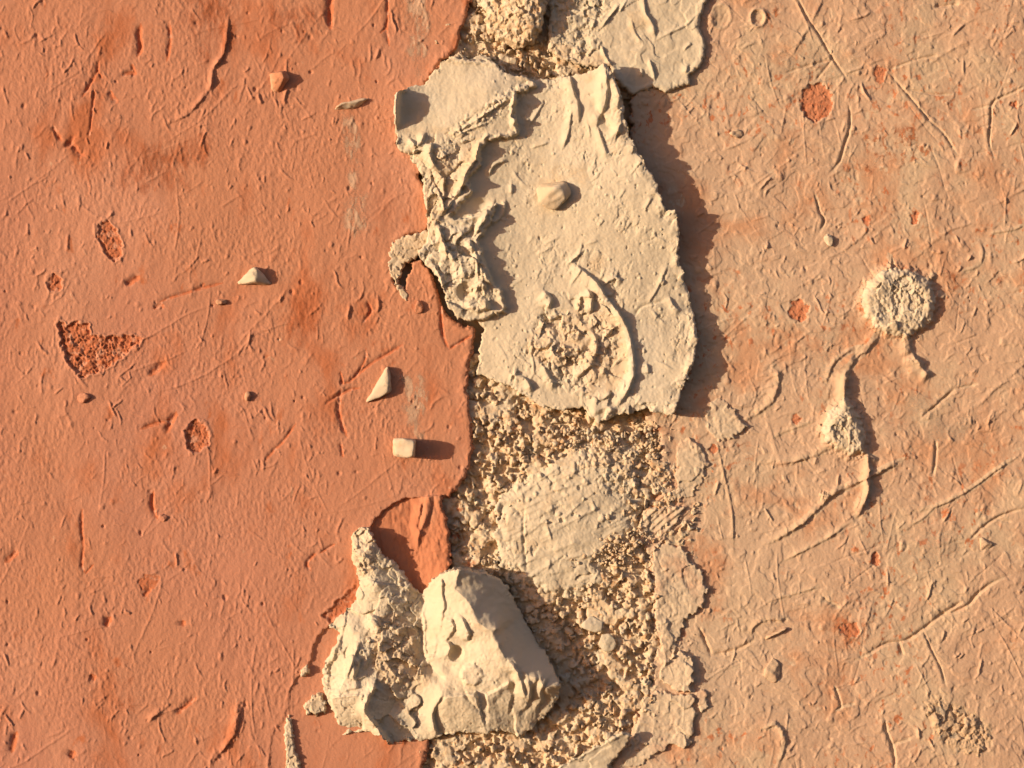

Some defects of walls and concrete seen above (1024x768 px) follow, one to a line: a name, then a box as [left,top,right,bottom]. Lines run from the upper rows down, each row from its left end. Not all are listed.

spalling [800,83,833,122]
spalling [96,220,123,262]
spalling [57,321,142,378]
peeling [269,0,748,768]
spalling [185,419,210,452]